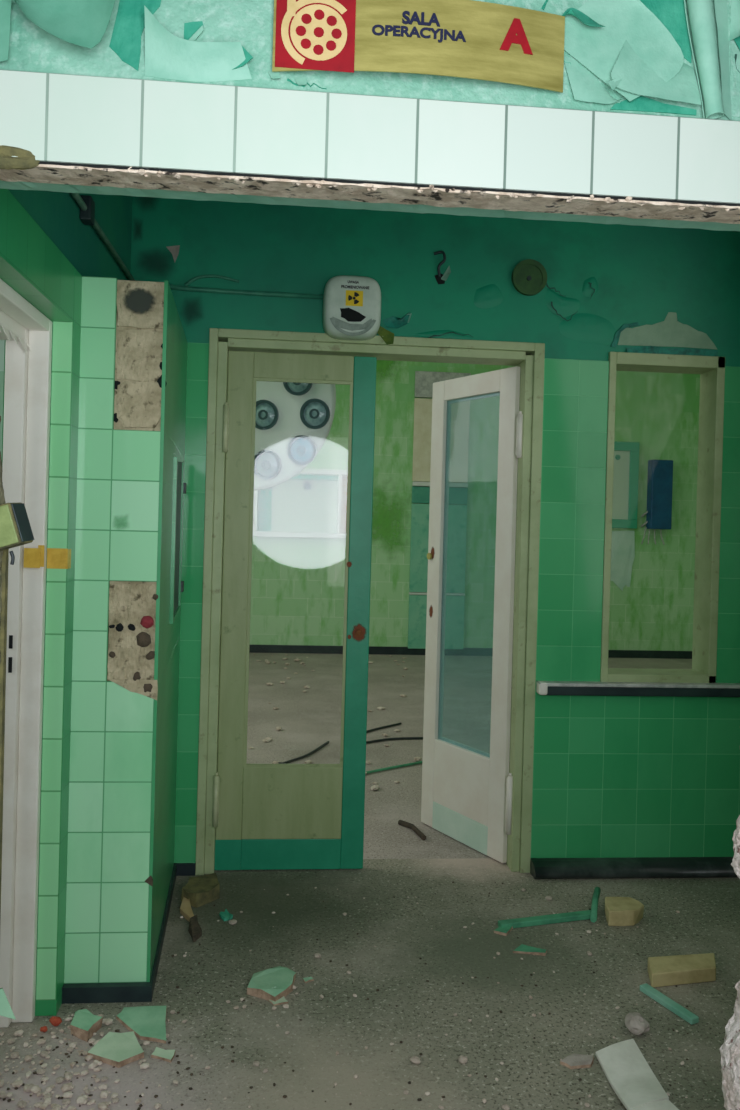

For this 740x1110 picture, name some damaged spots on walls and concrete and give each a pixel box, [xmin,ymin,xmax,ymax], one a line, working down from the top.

peeling [0,0,253,82]
peeling [562,0,740,120]
spalling [0,161,740,231]
peeling [167,245,180,262]
spalling [114,281,167,428]
peeling [377,311,412,345]
spalling [611,312,718,357]
damp [372,500,402,549]
peeling [610,531,635,591]
spalling [107,584,158,700]
spalling [0,549,9,920]